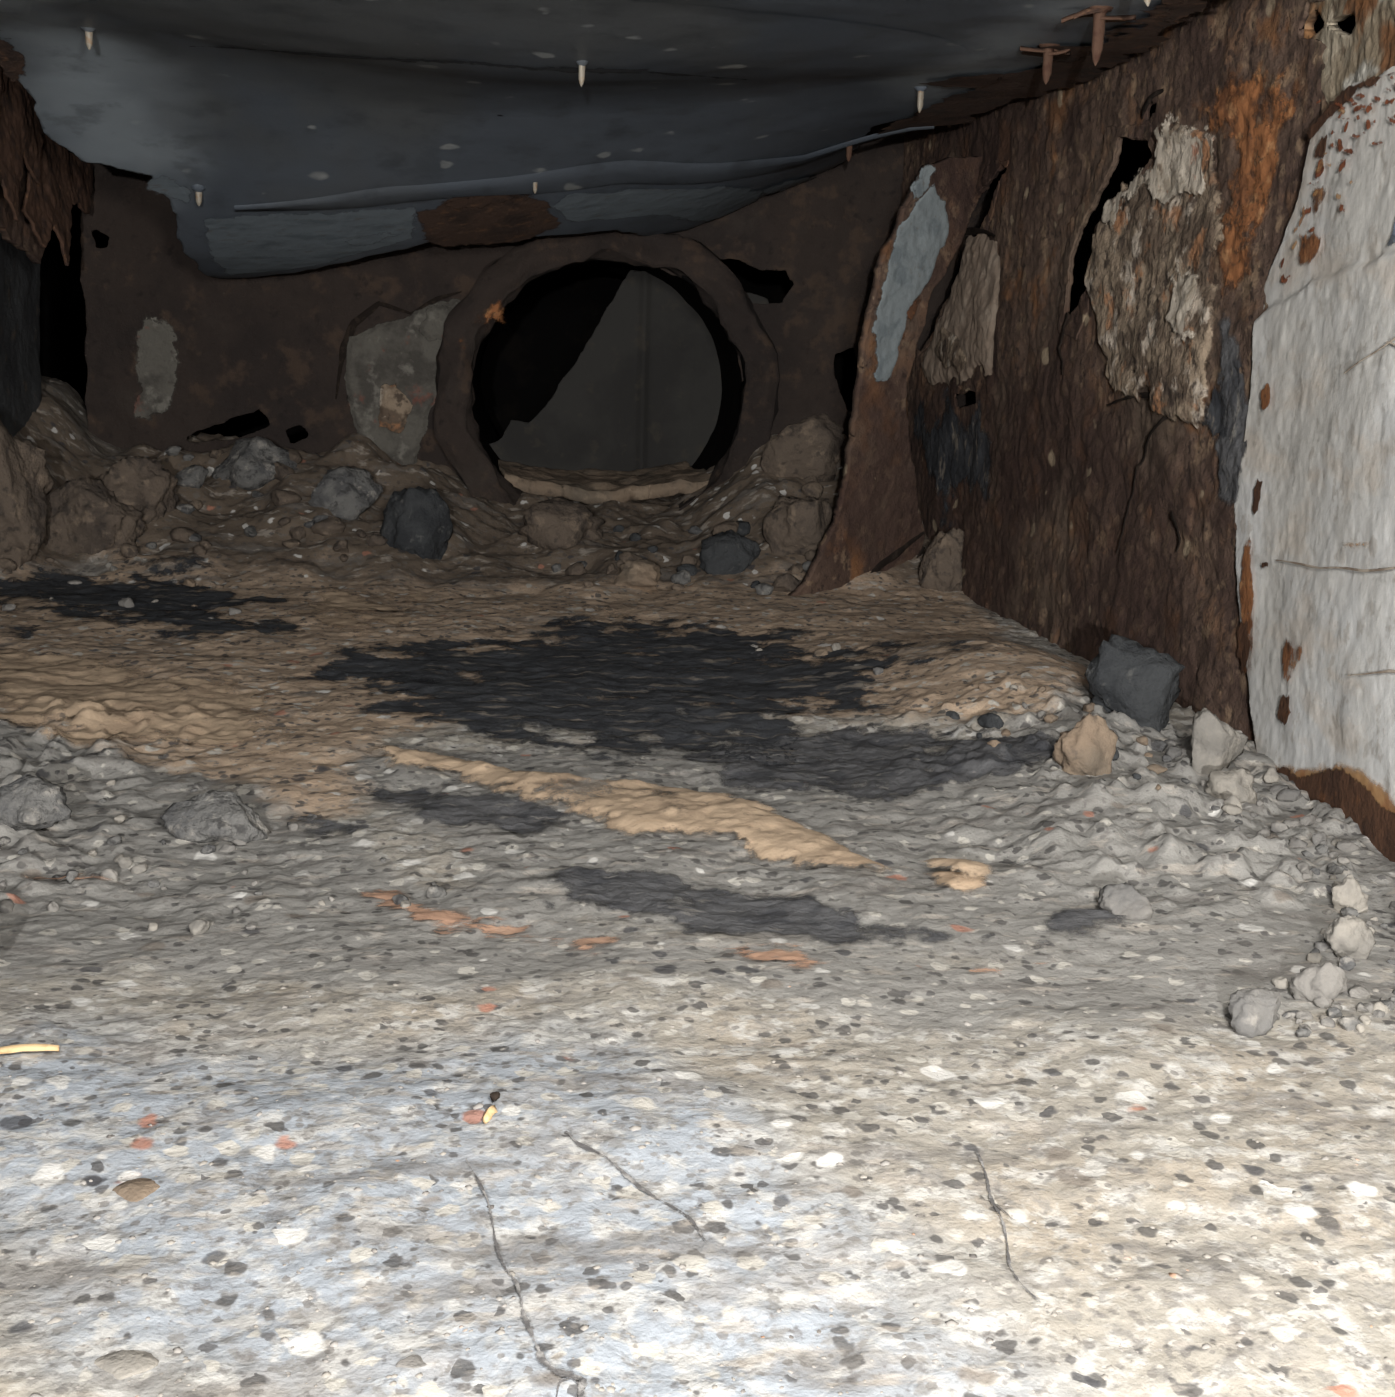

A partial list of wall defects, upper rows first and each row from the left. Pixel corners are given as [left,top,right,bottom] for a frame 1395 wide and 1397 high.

peeling [872,165,949,382]
spalling [921,233,1001,387]
rust [860,0,1208,145]
crack [1057,89,1164,375]
spalling [1084,116,1224,429]
rust [1198,64,1297,293]
rust [1281,72,1395,283]
rust [1252,479,1262,514]
rust [1237,538,1268,675]
rust [1277,639,1302,725]
crack [466,1158,587,1397]
crack [564,1131,707,1242]